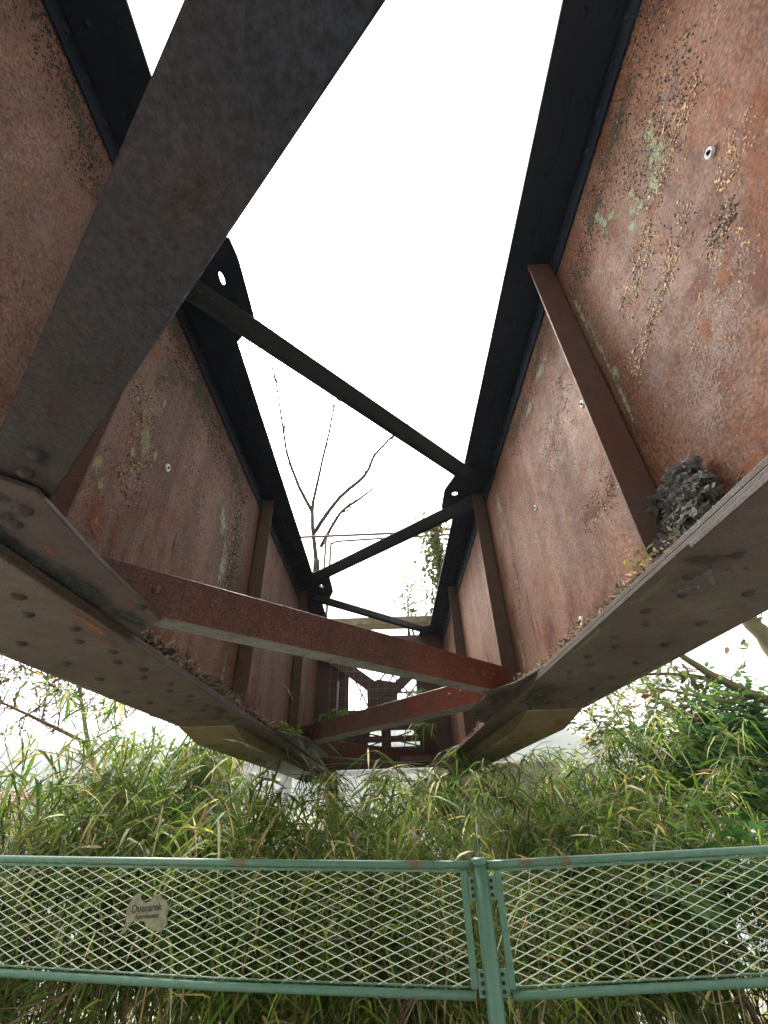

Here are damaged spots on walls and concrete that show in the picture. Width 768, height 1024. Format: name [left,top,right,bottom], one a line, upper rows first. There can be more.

corrosion [684,229,768,437]